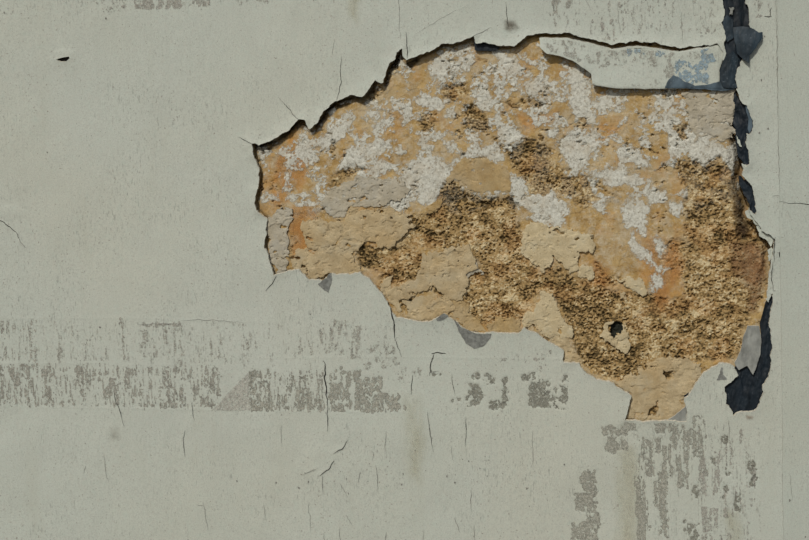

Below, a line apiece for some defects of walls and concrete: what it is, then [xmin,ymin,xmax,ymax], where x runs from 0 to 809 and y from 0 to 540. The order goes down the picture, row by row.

spalling [252,0,775,540]